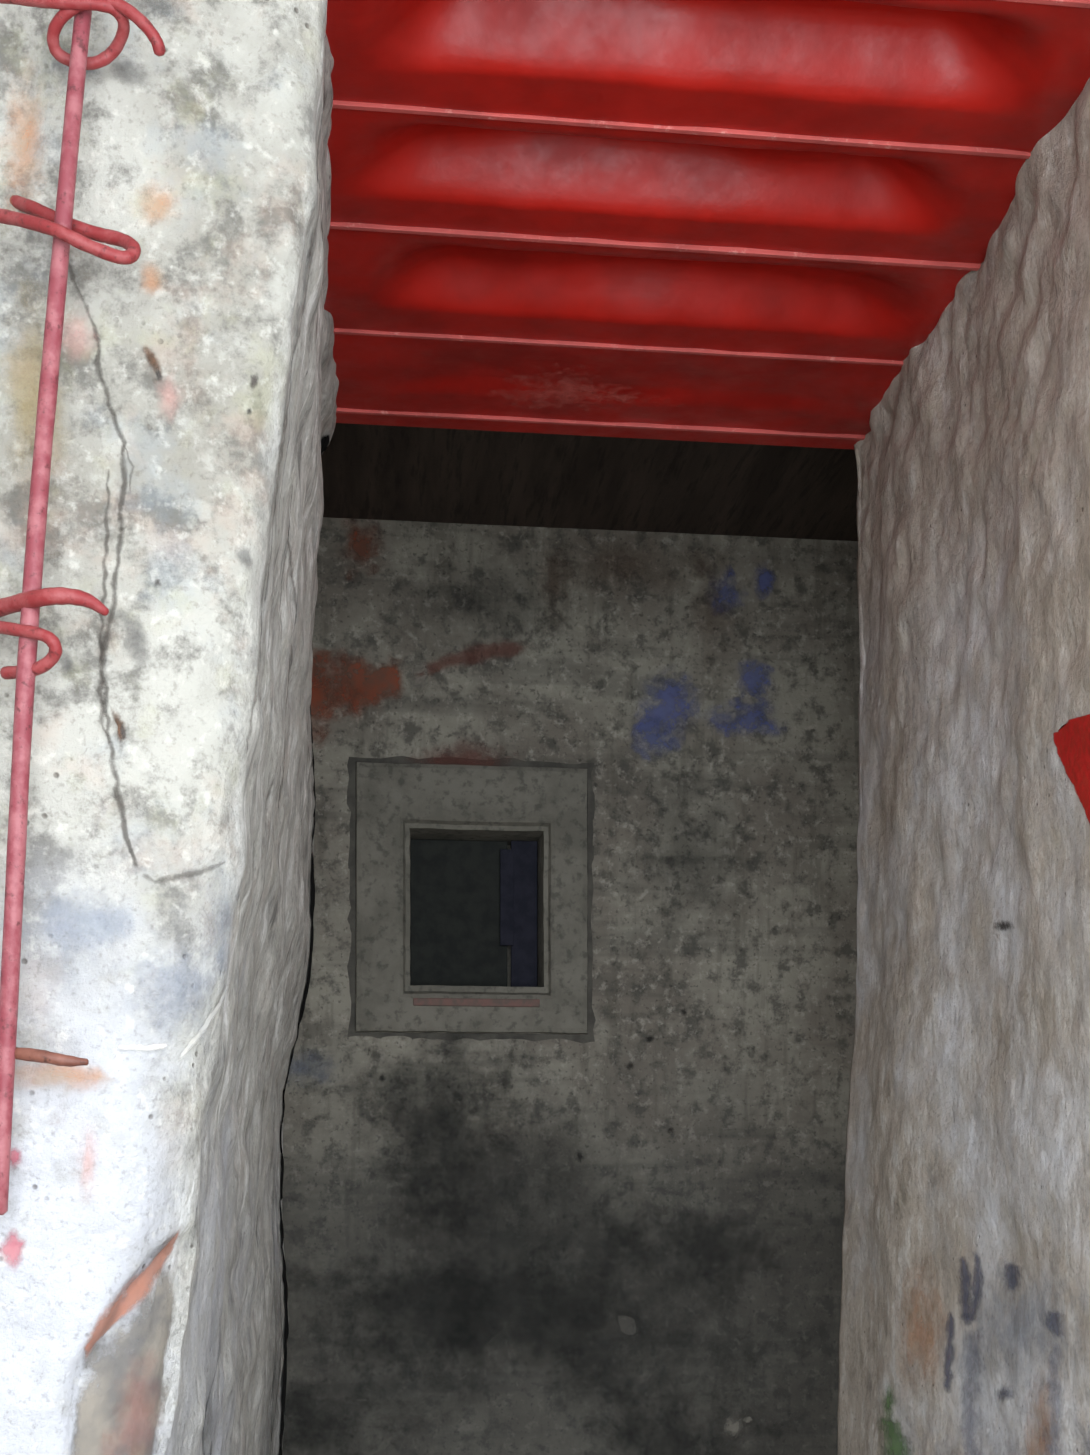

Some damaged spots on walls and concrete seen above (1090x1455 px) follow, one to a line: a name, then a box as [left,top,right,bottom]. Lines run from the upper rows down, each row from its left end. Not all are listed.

crack [69,264,137,865]
crack [321,435,330,455]
crack [279,706,316,1455]